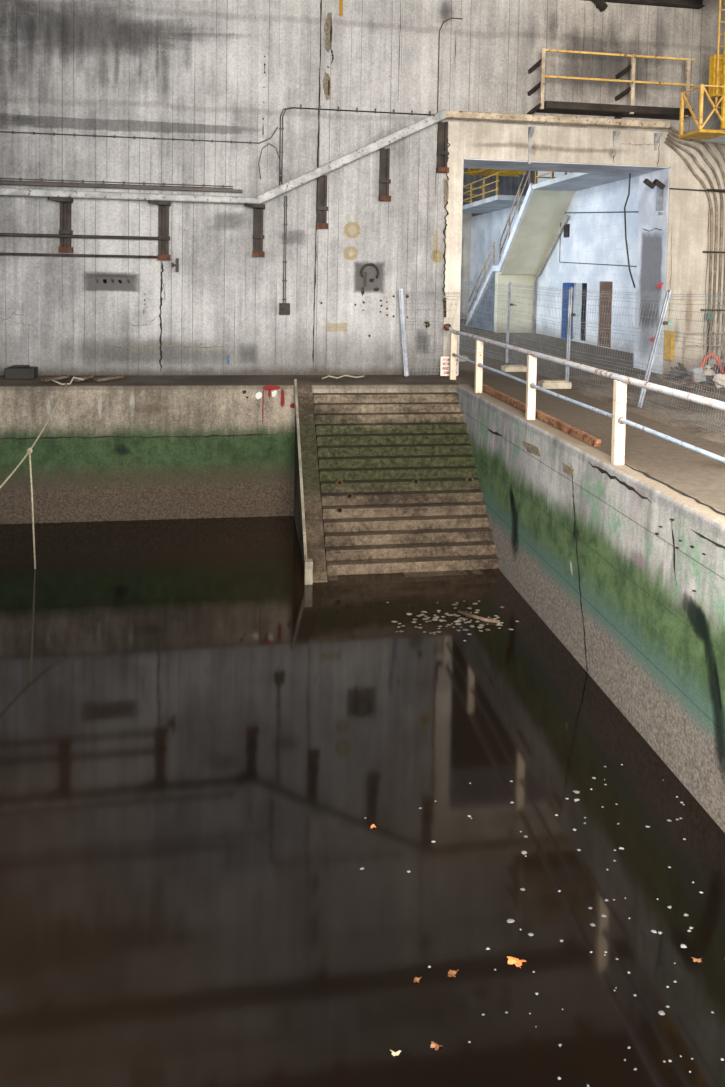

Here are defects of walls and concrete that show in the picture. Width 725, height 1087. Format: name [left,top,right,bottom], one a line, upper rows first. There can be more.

water stain [510,489,518,552]
water stain [684,599,725,770]